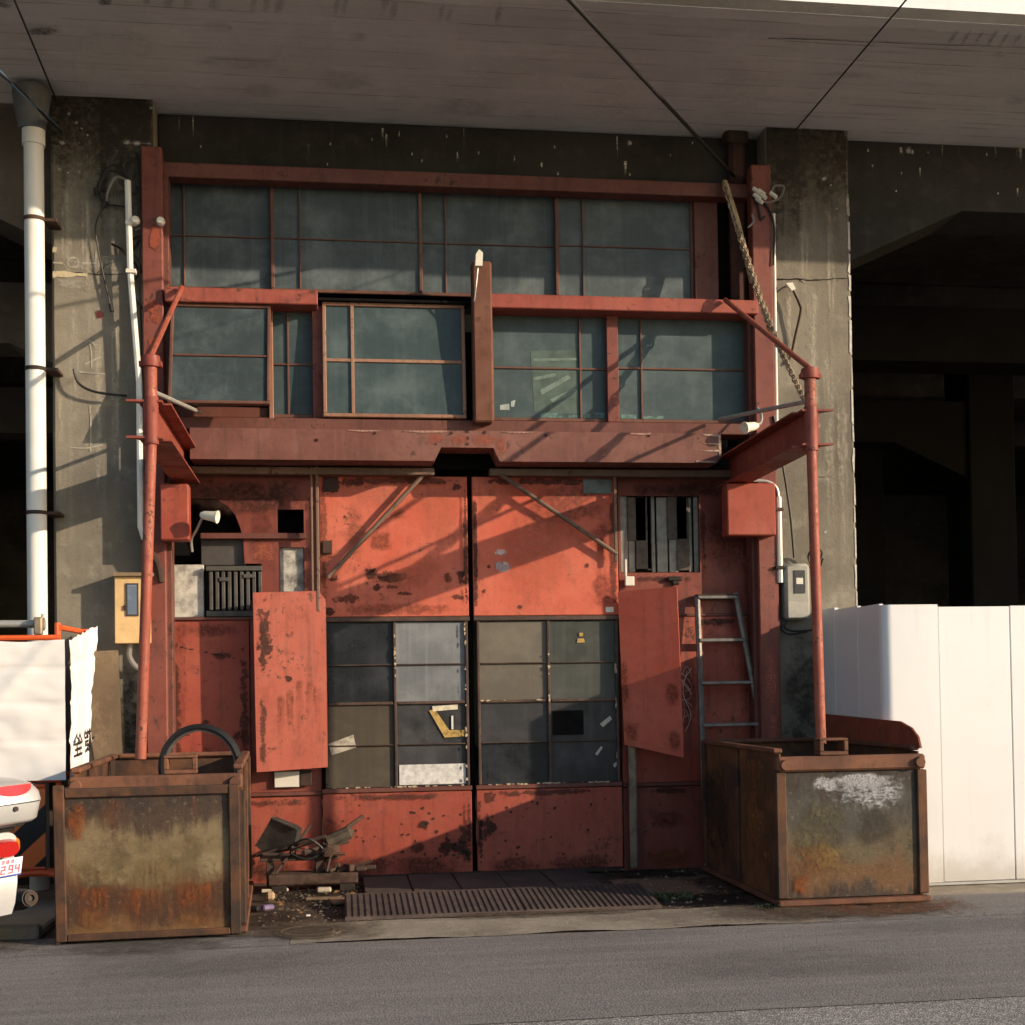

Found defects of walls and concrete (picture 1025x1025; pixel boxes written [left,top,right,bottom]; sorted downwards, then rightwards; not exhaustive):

corrosion [463,491,478,606]
corrosion [609,495,617,603]
corrosion [409,821,428,853]
corrosion [438,788,590,863]